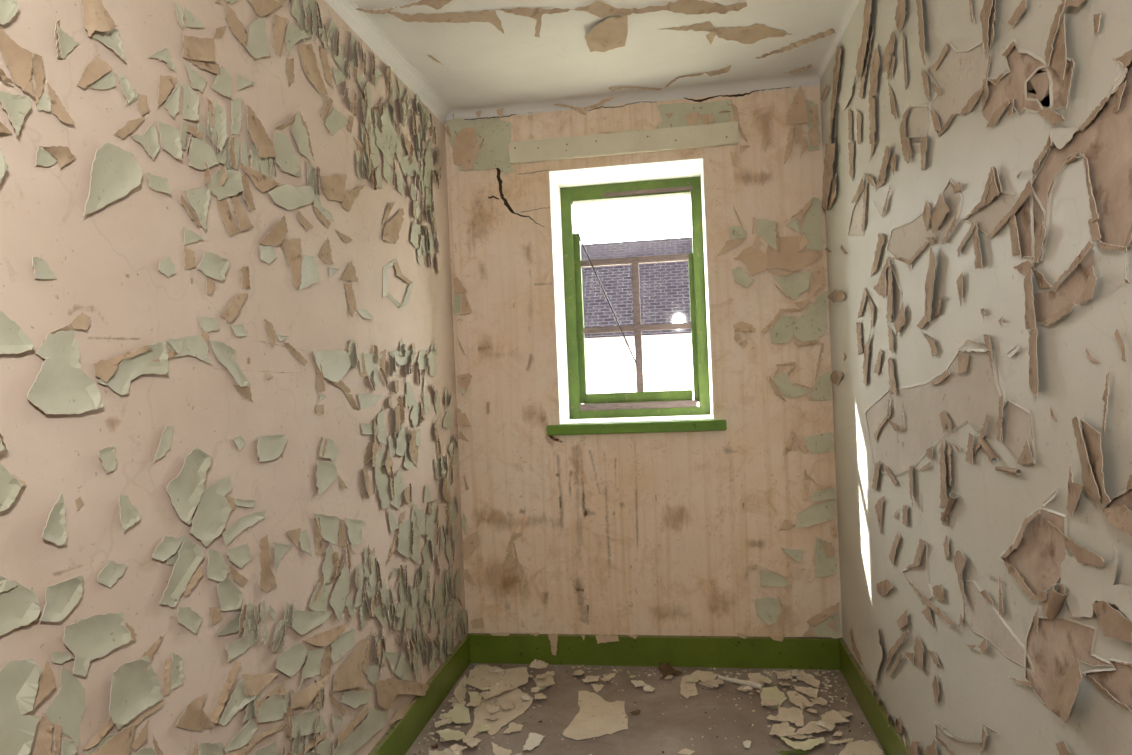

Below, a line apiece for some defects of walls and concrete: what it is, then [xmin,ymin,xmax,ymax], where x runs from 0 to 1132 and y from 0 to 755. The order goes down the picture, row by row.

peeling [0,0,516,415]
crack [488,168,549,227]
peeling [0,432,26,512]
peeling [42,492,83,546]
peeling [152,319,511,755]
peeling [0,575,185,755]